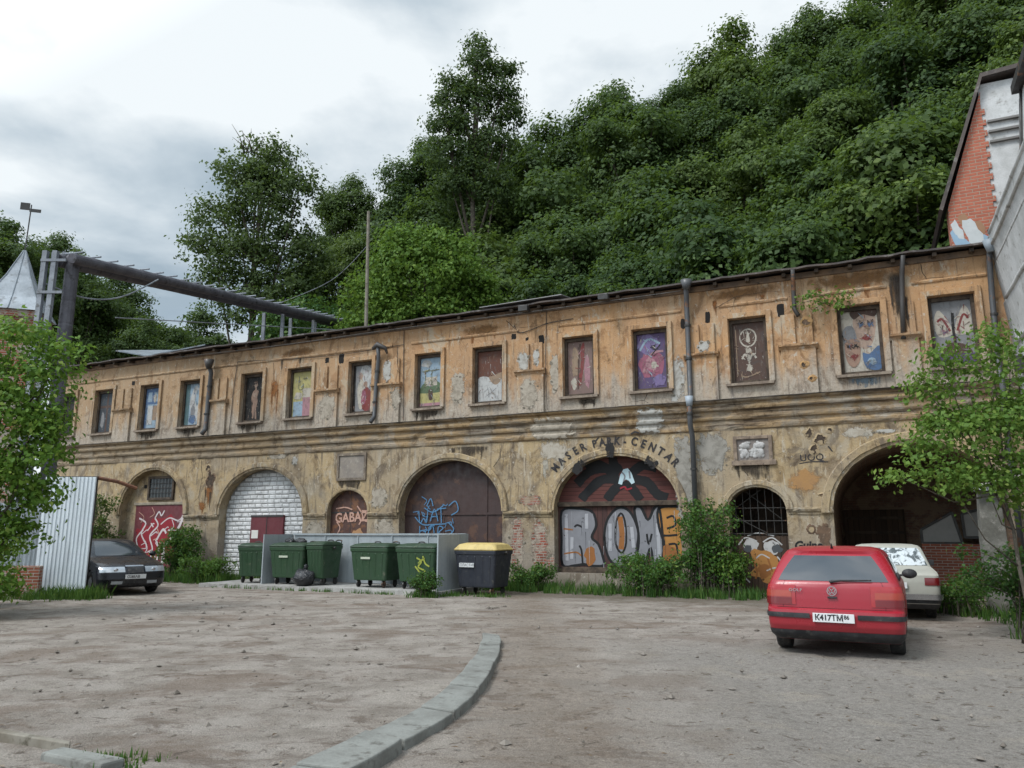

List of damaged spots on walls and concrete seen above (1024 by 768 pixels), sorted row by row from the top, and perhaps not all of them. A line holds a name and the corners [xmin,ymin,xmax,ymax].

flaking render [511,334,577,441]
flaking render [799,360,818,382]
flaking render [636,407,664,434]
spalling [508,517,554,570]